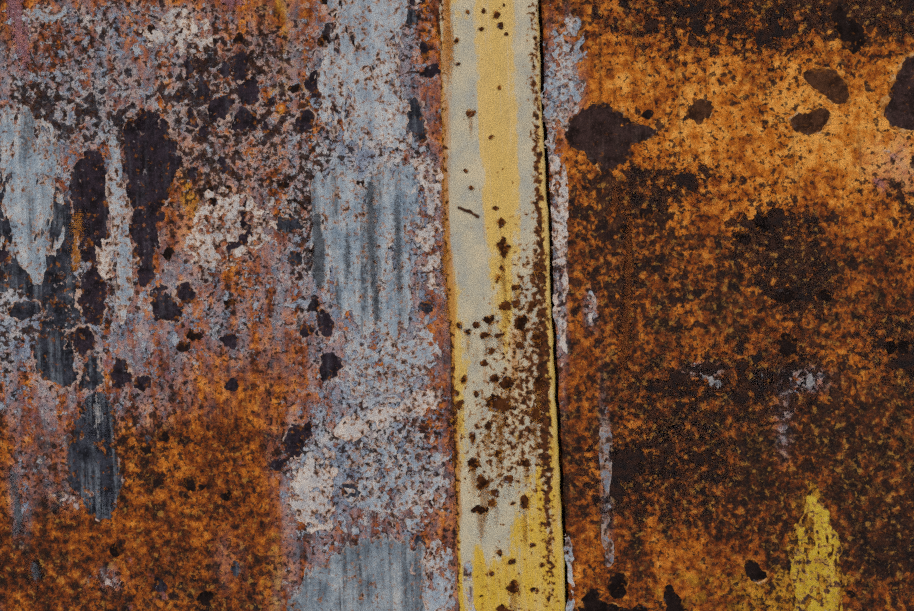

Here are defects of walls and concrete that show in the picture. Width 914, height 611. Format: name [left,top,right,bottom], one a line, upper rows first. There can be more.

corrosion [481,3,508,36]
corrosion [618,0,811,55]
peeling [880,51,914,134]
peeling [540,11,657,378]
peeling [0,0,476,611]
corrosion [441,168,542,367]
corrosion [473,373,514,431]
corrosion [642,350,798,421]
corrosion [468,457,514,515]
peeling [563,427,648,611]
peeling [786,493,856,611]
peeling [663,584,688,611]